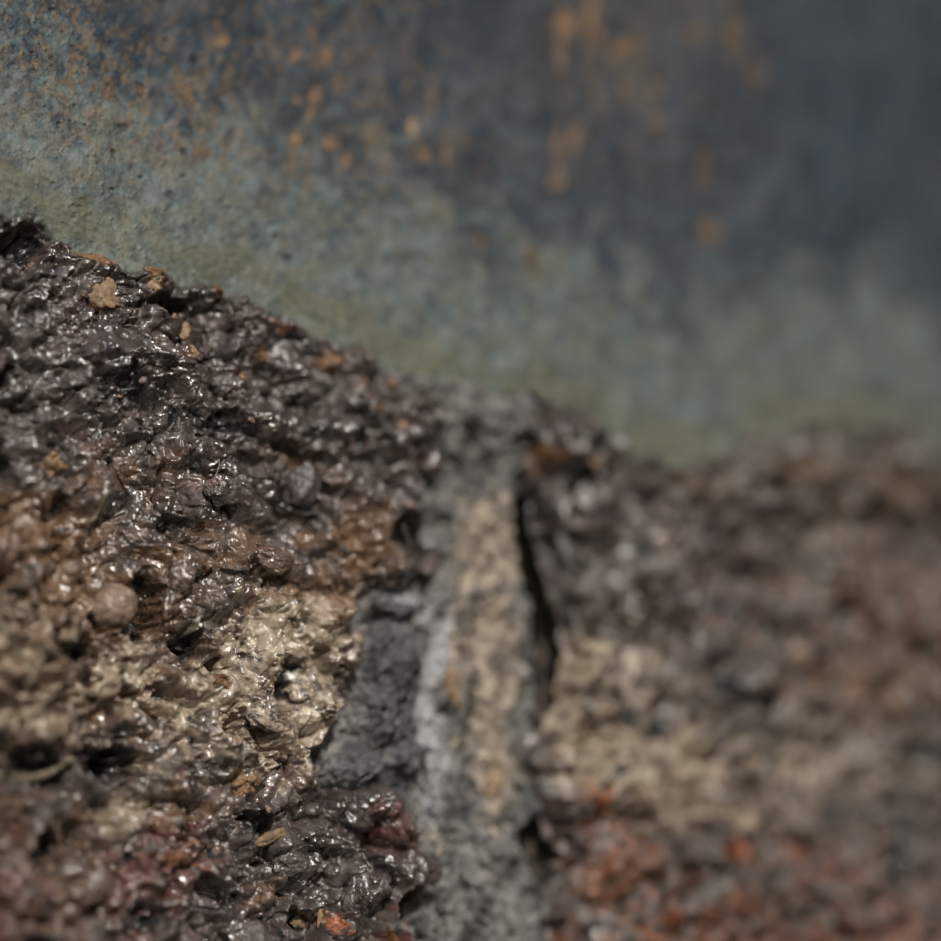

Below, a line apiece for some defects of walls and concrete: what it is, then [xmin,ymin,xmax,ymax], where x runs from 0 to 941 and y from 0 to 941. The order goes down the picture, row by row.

rust [288,84,322,170]
crack [510,464,564,734]
crack [517,803,563,936]